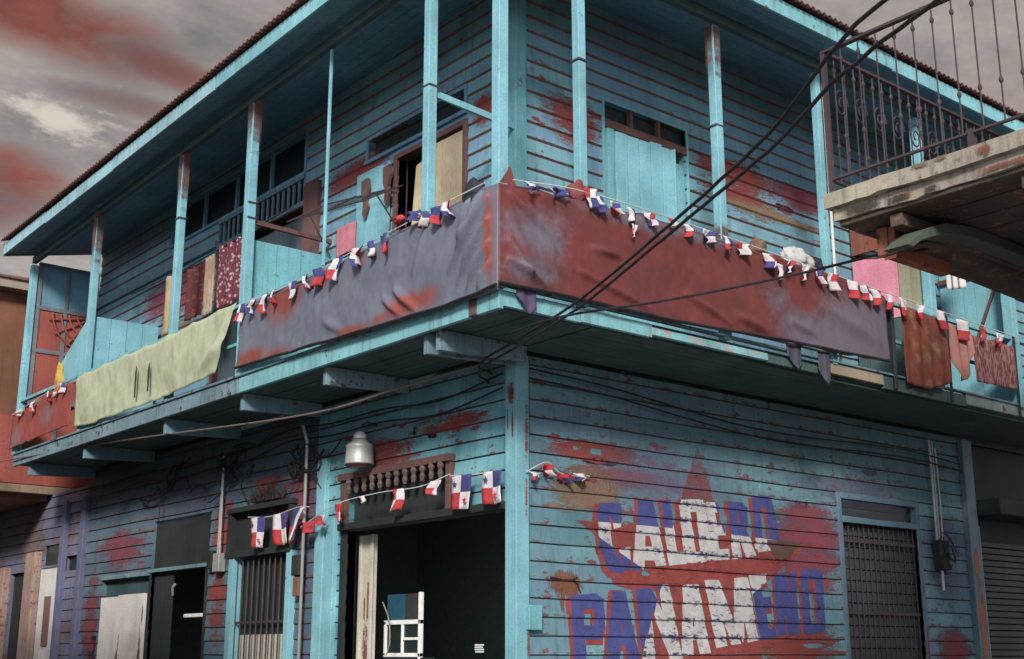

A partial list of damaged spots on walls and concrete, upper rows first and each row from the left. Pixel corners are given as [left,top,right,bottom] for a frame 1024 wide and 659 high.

peeling [532,91,573,150]
peeling [586,102,602,145]
peeling [328,146,390,197]
peeling [690,147,848,244]
peeling [351,409,489,469]
peeling [539,433,730,514]
peeling [80,528,151,659]